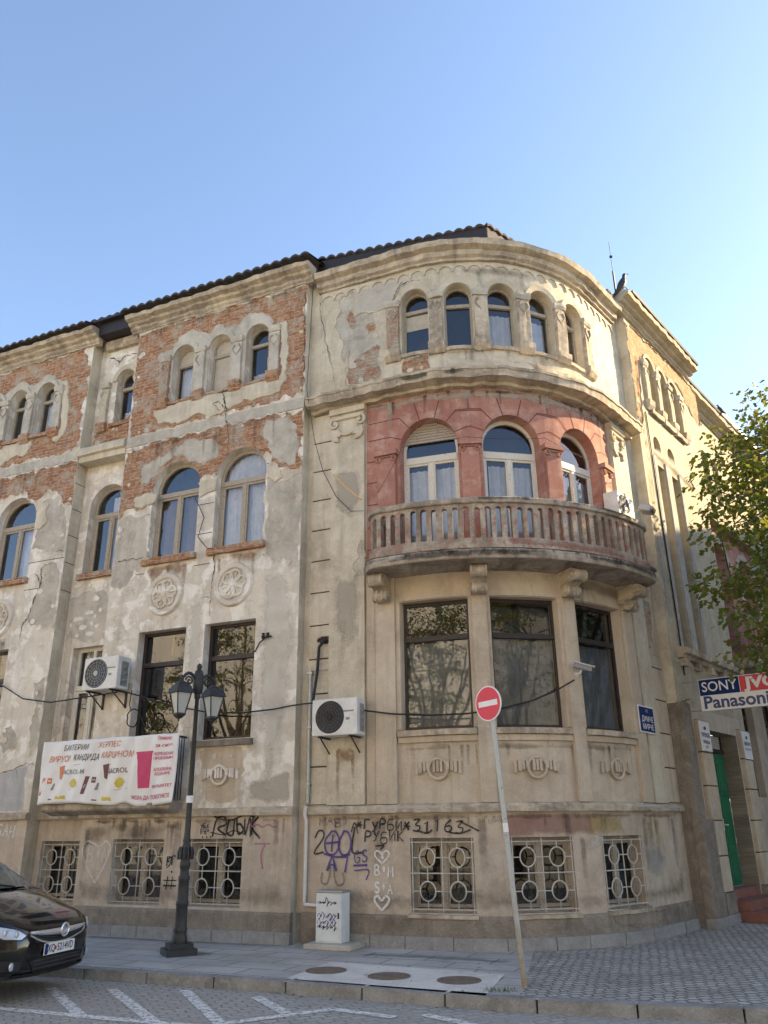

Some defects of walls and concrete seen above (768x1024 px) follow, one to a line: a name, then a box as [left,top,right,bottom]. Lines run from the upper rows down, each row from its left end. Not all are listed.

crack [299,292,334,392]
spalling [333,281,400,387]
spalling [0,284,308,737]